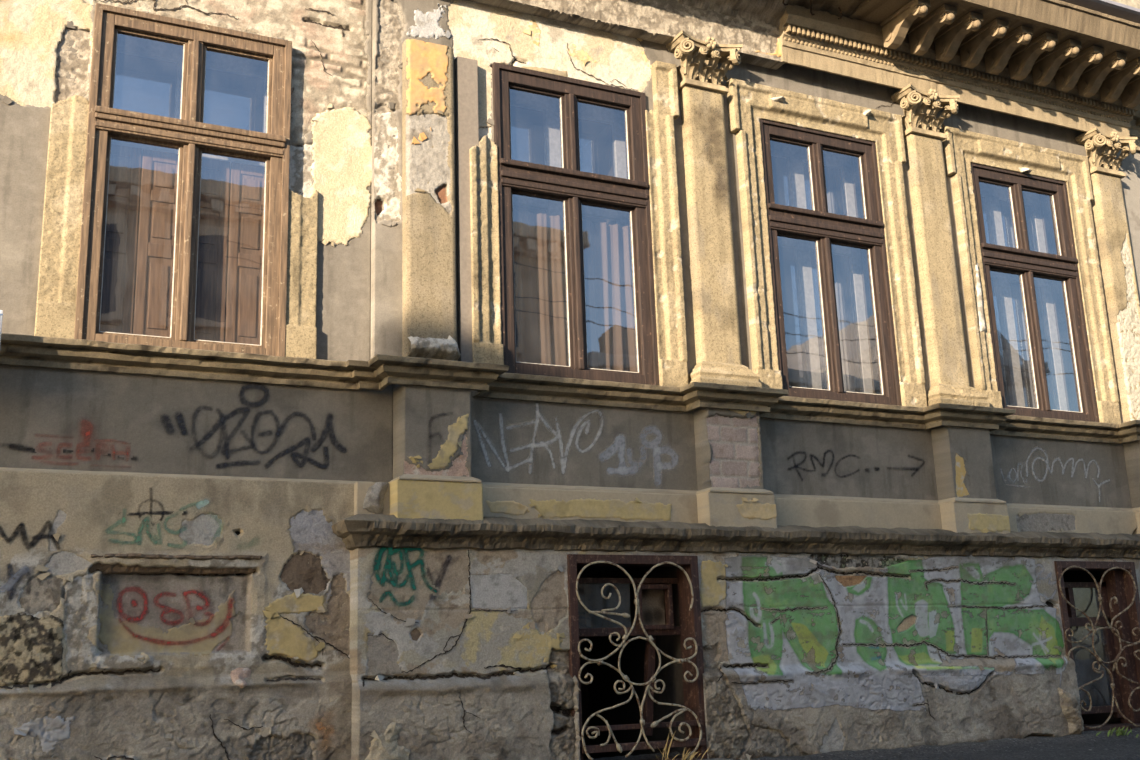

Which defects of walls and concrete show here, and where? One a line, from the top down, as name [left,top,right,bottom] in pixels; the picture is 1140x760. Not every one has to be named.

flaking render [0,0,782,247]
crack [479,38,526,66]
crack [567,43,635,90]
spalling [1116,233,1140,421]
crack [94,752,134,760]
peeling [0,510,241,692]
crack [210,714,263,760]
spalling [263,506,350,663]
spalling [365,549,581,760]
peeling [486,498,672,521]
crack [701,560,1061,720]
peeling [912,656,1016,695]